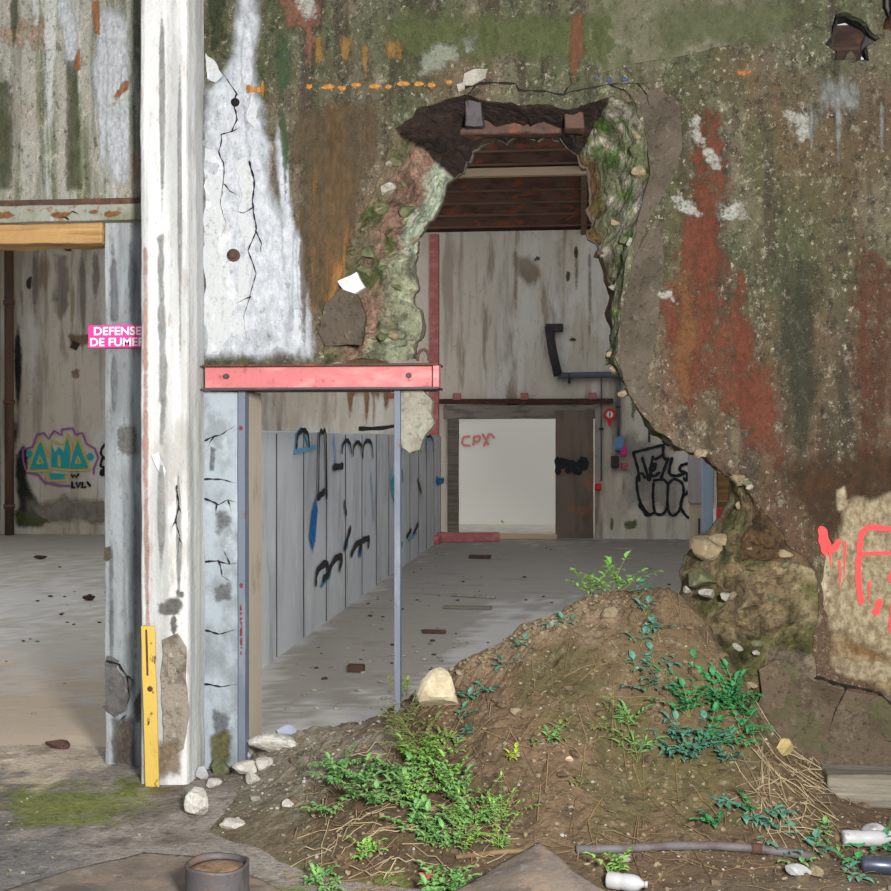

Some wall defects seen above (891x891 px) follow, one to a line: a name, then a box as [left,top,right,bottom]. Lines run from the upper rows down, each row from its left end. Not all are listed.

water stain [57,0,80,190]
water stain [92,9,130,184]
crack [218,75,262,337]
corrosion [311,217,349,323]
spalling [319,69,891,767]
crack [172,485,182,559]
crack [204,478,235,510]
crack [205,551,234,582]
spalling [104,656,133,717]
spalling [161,633,190,752]